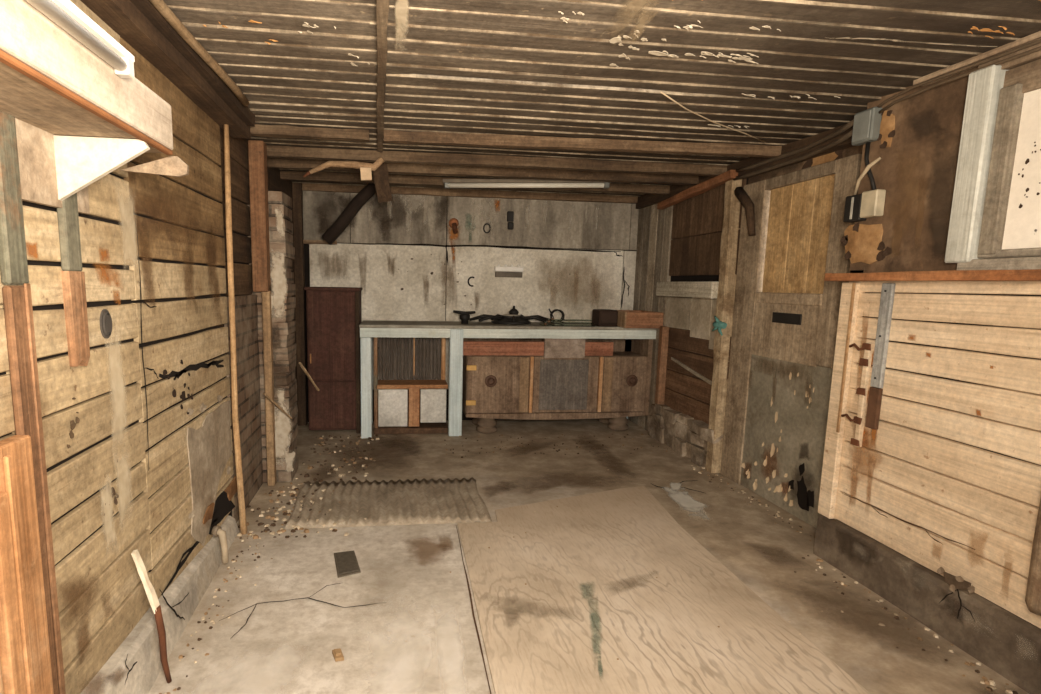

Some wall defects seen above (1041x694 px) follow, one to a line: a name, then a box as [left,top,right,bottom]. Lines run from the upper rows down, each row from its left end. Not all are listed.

peeling [609,30,759,67]
leakage [373,196,411,236]
crack [135,222,224,471]